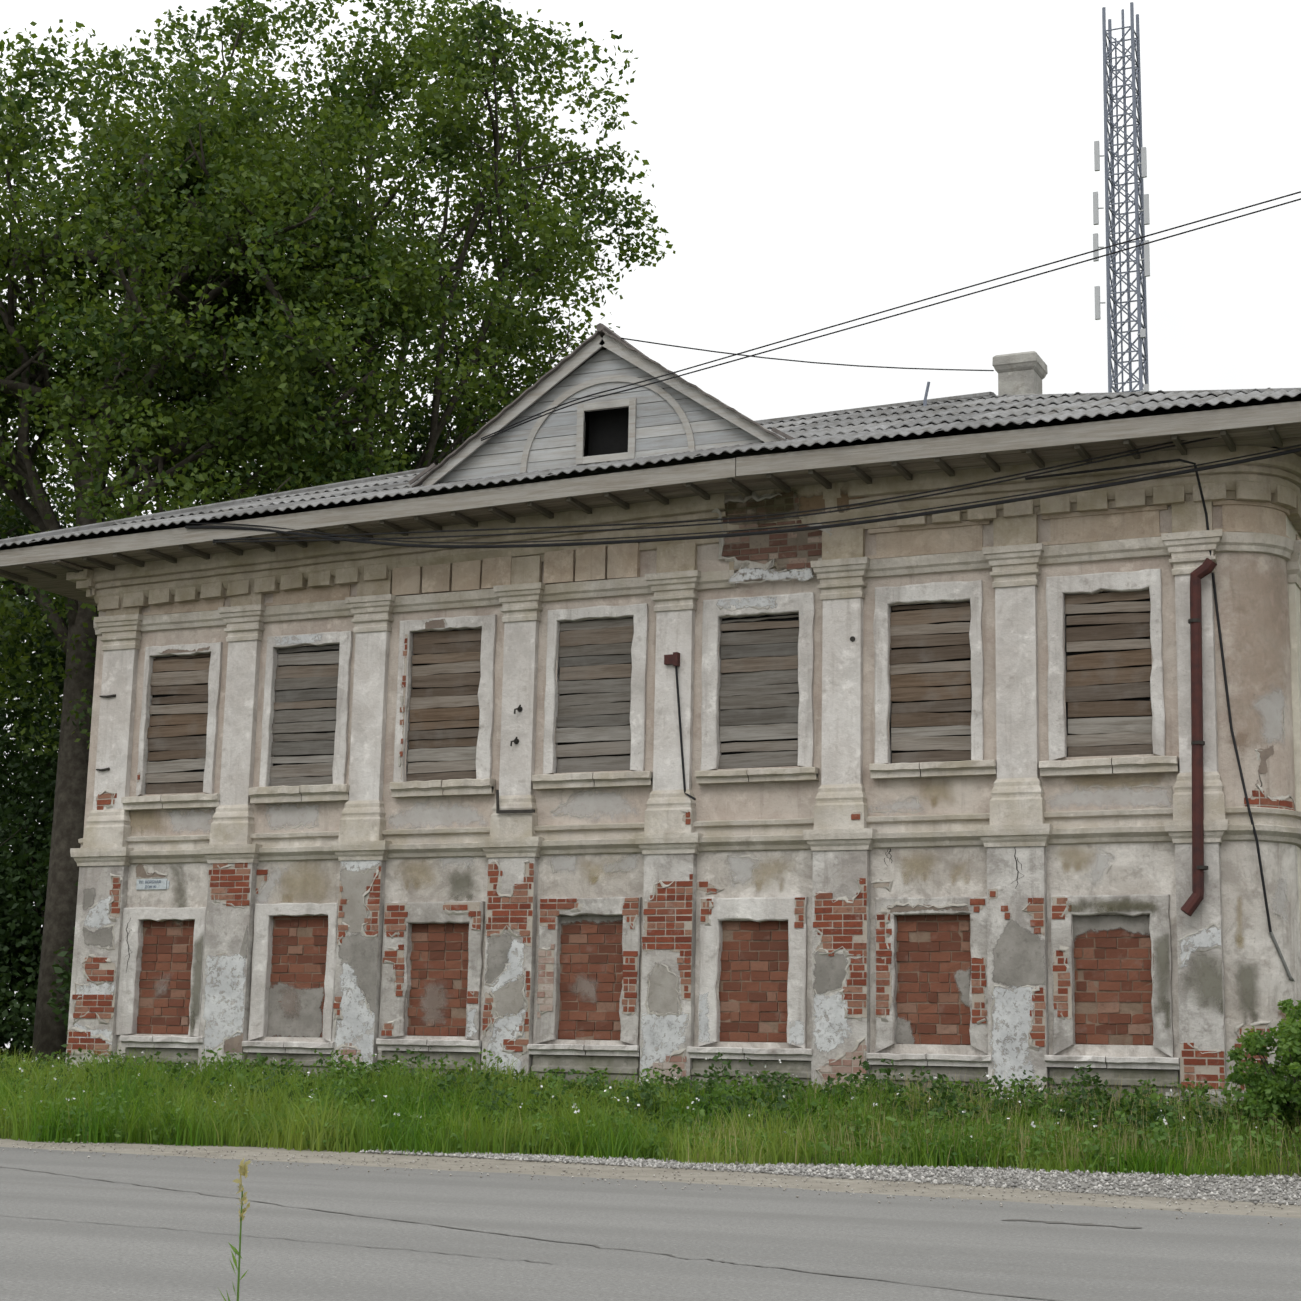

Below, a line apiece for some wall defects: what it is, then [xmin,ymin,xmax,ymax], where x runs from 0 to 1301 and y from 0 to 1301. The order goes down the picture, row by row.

flaking render [711,491,832,611]
peeling [1244,691,1296,811]
peeling [66,954,117,1057]
flaking render [208,863,281,911]
peeling [333,963,395,1072]
flaking render [337,860,410,997]
flaking render [442,859,583,1080]
flaking render [622,855,761,1091]
flaking render [789,878,1072,1092]
flaking render [1180,1021,1273,1094]